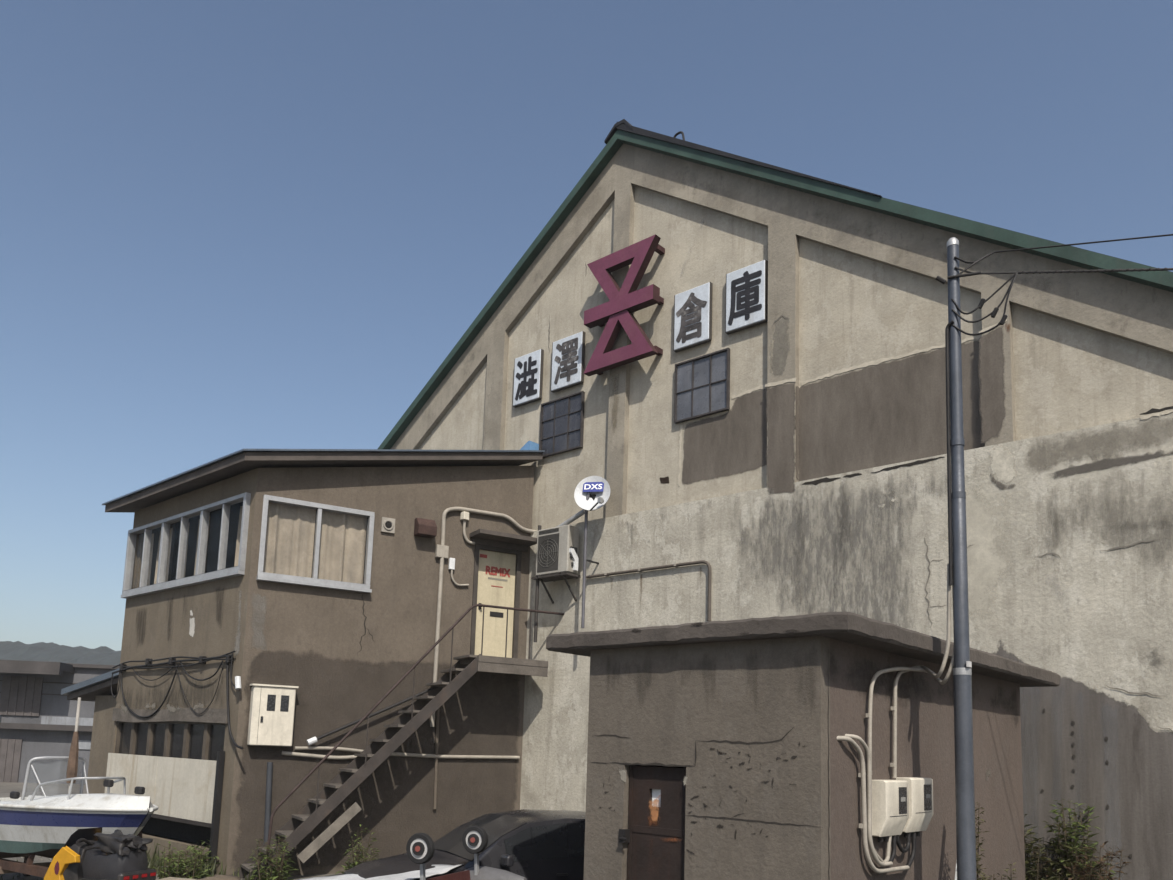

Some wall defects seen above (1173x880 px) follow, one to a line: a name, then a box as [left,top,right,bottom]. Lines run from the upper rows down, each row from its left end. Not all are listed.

peeling [1028,410,1173,470]
damp [741,487,907,625]
crack [925,535,975,628]
crack [357,595,374,654]
peeling [992,640,1035,667]
crack [591,727,794,767]
crack [685,654,830,880]
peeling [1020,670,1173,880]
rust [648,796,660,824]